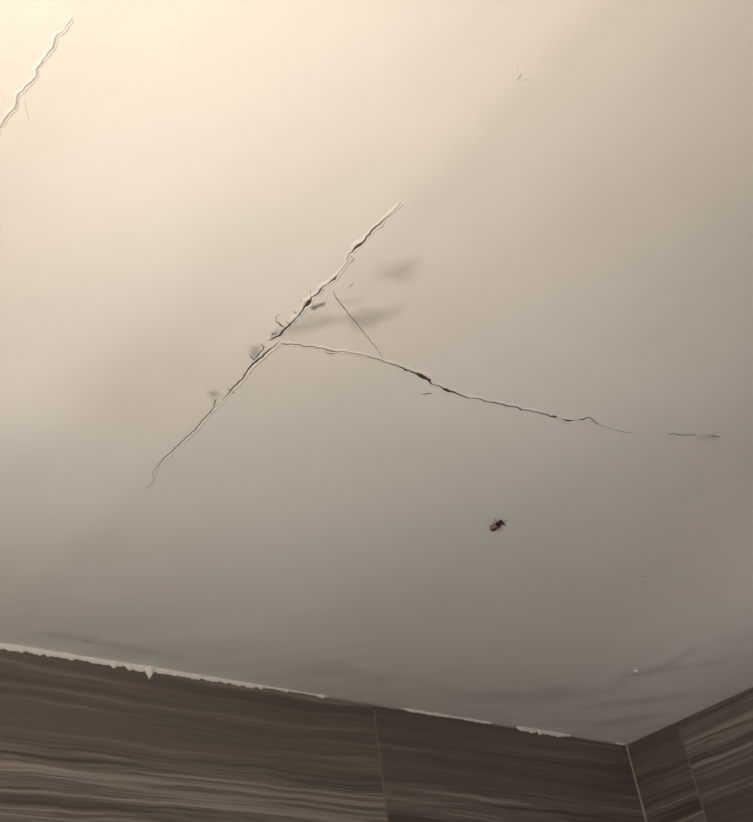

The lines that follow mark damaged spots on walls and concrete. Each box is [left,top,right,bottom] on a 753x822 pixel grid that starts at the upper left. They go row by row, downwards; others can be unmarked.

crack [0,16,75,135]
crack [147,201,636,488]